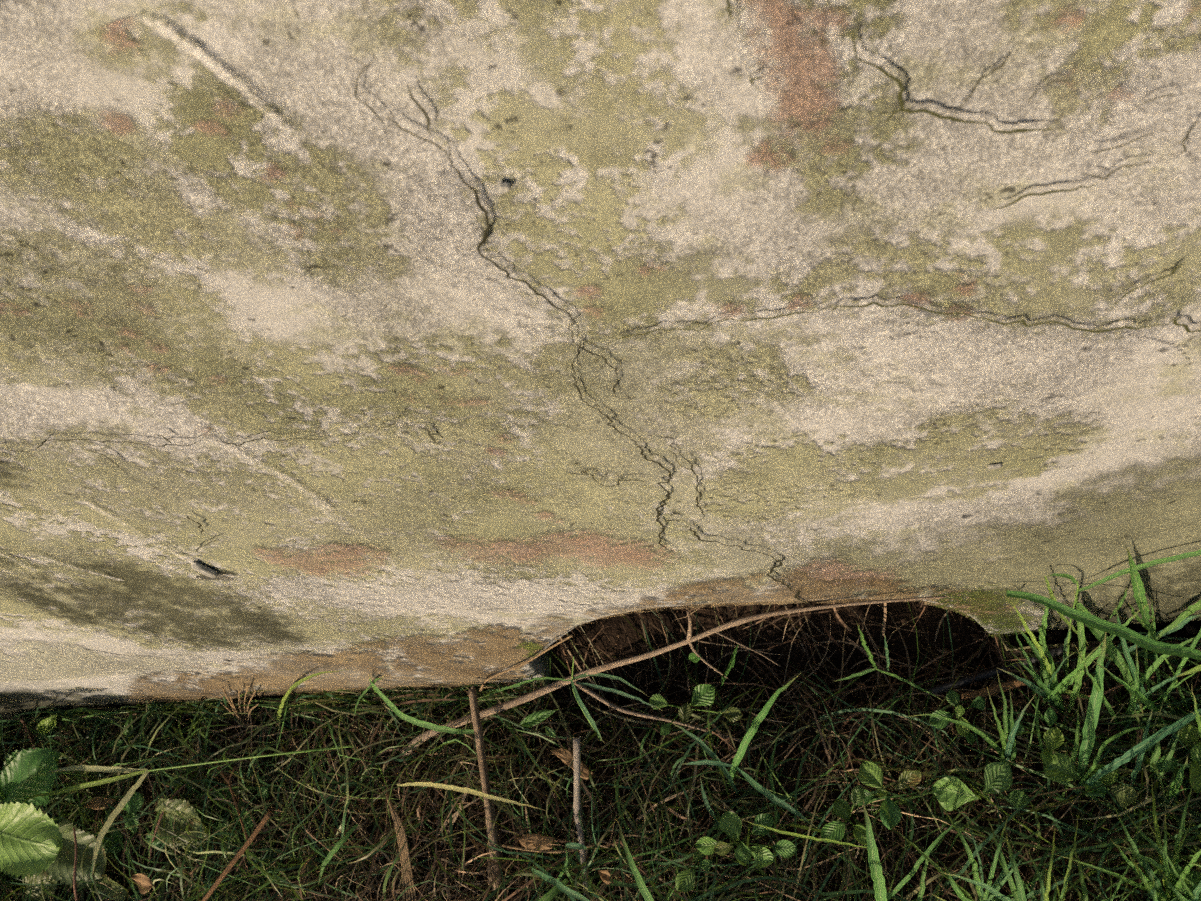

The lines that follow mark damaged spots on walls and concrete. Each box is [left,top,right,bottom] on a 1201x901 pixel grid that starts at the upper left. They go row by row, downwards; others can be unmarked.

crack [726,0,741,20]
crack [839,31,1067,134]
crack [350,57,1201,607]
water stain [805,459,1201,631]
water stain [0,565,300,719]